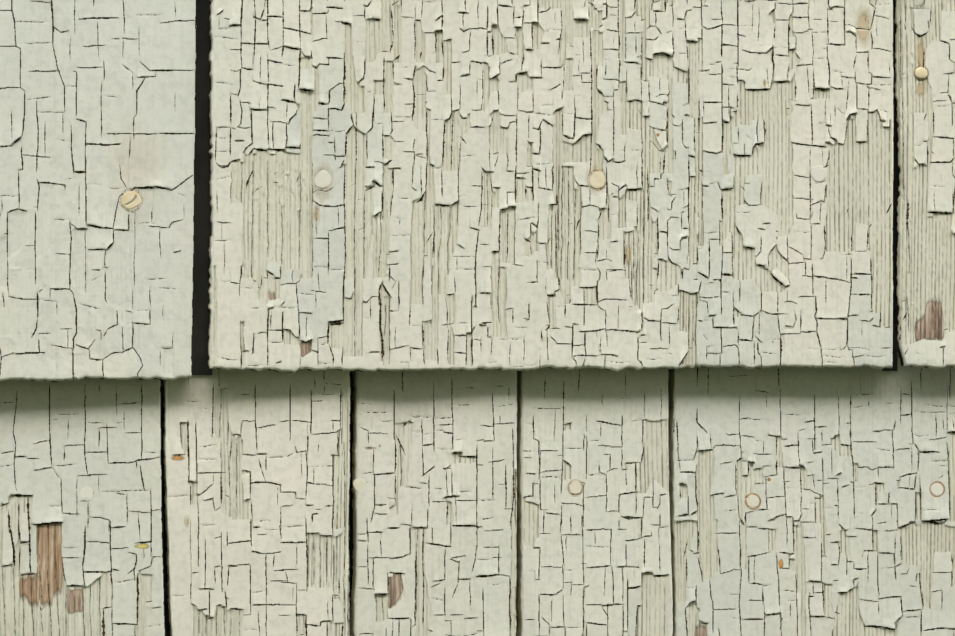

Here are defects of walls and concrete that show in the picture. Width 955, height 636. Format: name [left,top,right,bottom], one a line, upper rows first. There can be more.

peeling [230,0,472,366]
peeling [482,0,703,368]
peeling [702,0,745,46]
peeling [720,0,809,292]
peeling [825,0,955,344]
crack [0,0,197,636]
peeling [0,496,113,636]
peeling [297,389,350,636]
peeling [375,526,431,636]
peeling [510,468,540,636]
peeling [628,418,718,636]
peeling [775,437,827,636]